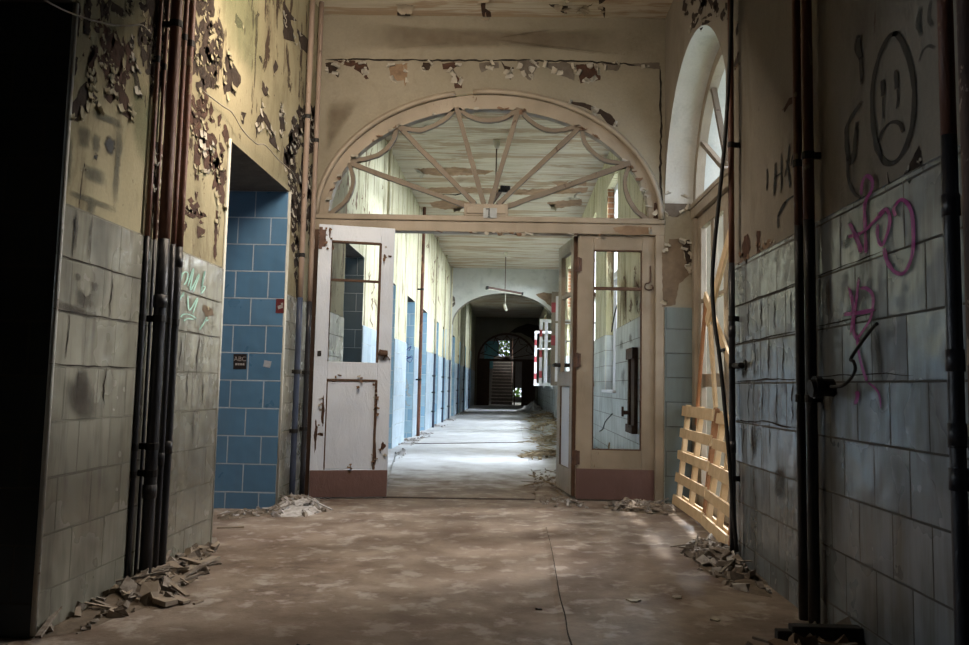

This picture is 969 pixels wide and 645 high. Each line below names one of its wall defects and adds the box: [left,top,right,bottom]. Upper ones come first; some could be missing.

peeling [283,2,308,53]
peeling [478,0,491,21]
peeling [549,0,605,18]
peeling [682,0,727,34]
peeling [65,0,171,123]
peeling [325,59,369,79]
peeling [420,59,464,89]
peeling [150,138,163,238]
peeling [241,56,315,298]
peeling [622,158,661,221]
peeling [314,396,325,453]
peeling [356,375,380,431]